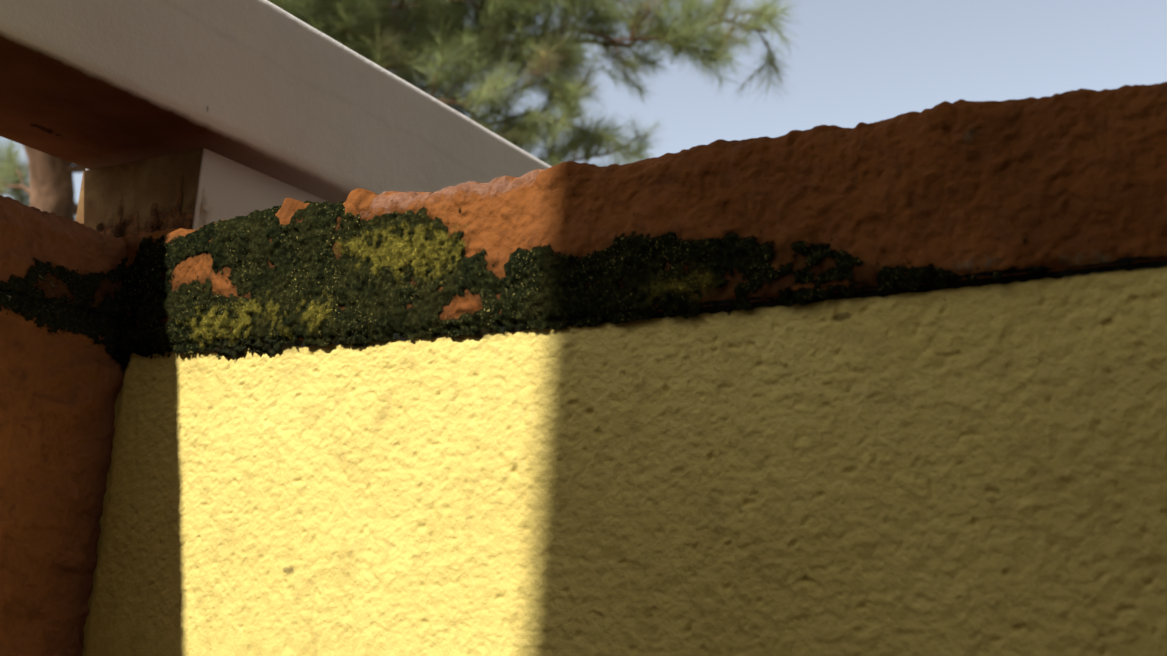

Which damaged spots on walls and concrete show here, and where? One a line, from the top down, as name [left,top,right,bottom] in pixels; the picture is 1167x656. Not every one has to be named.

crack [0,257,128,362]
damp [76,148,1050,358]